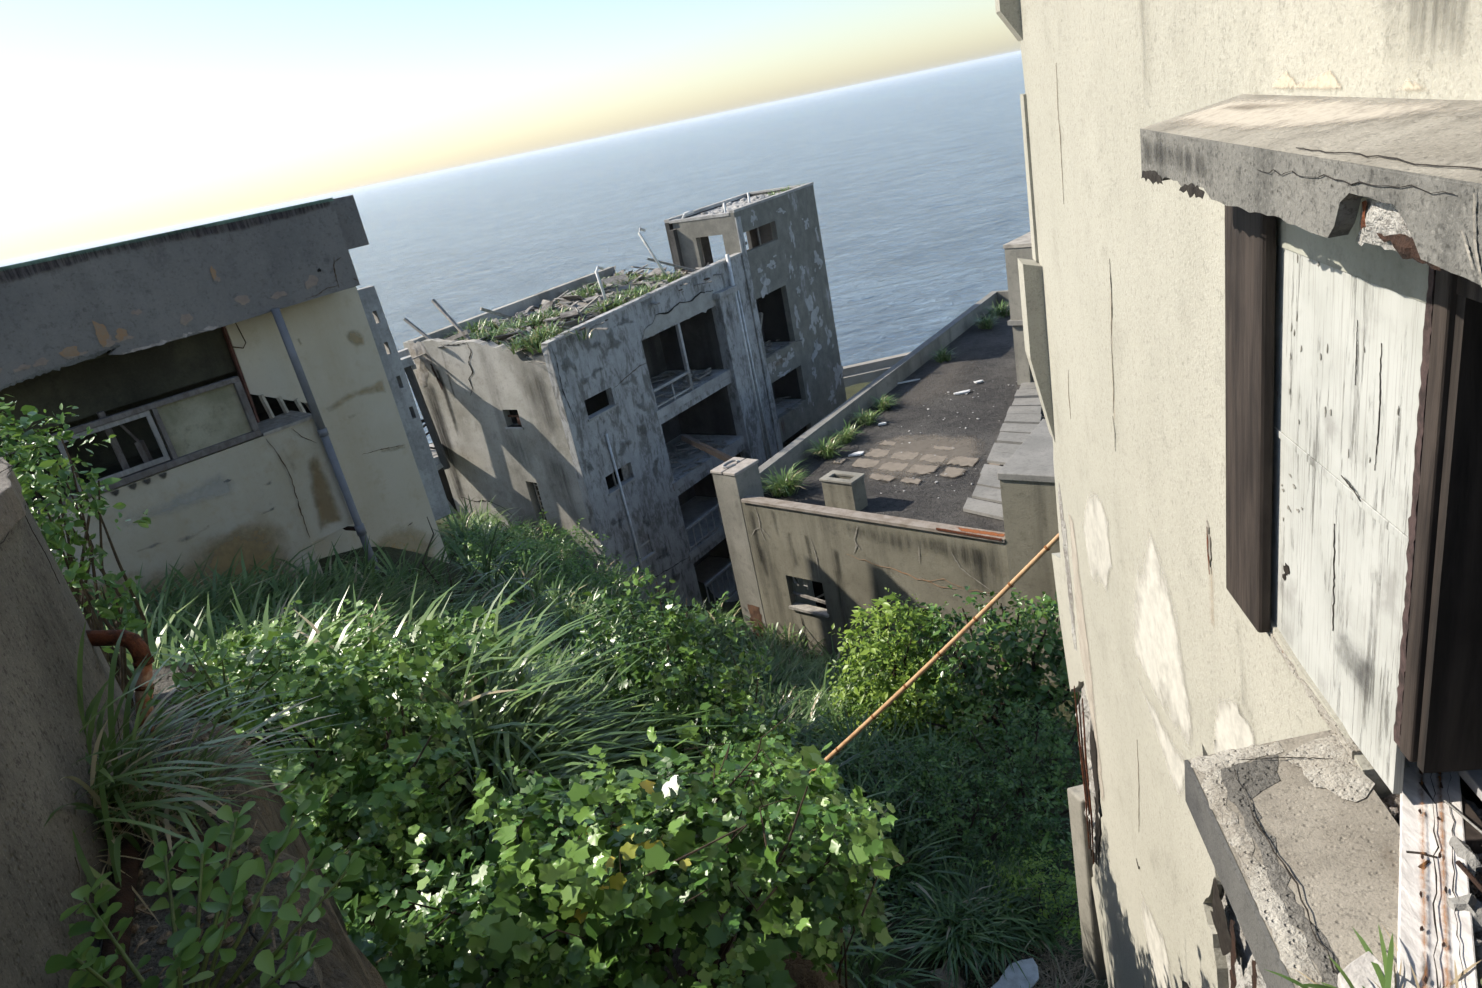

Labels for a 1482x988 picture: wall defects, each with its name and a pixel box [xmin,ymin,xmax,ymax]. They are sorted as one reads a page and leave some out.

crack [1258,147,1482,287]
spalling [1356,199,1441,271]
spalling [0,320,134,391]
peeling [758,208,844,406]
crack [266,429,316,537]
water stain [311,462,339,524]
spalling [1190,734,1375,988]
corrosion [1418,769,1450,988]